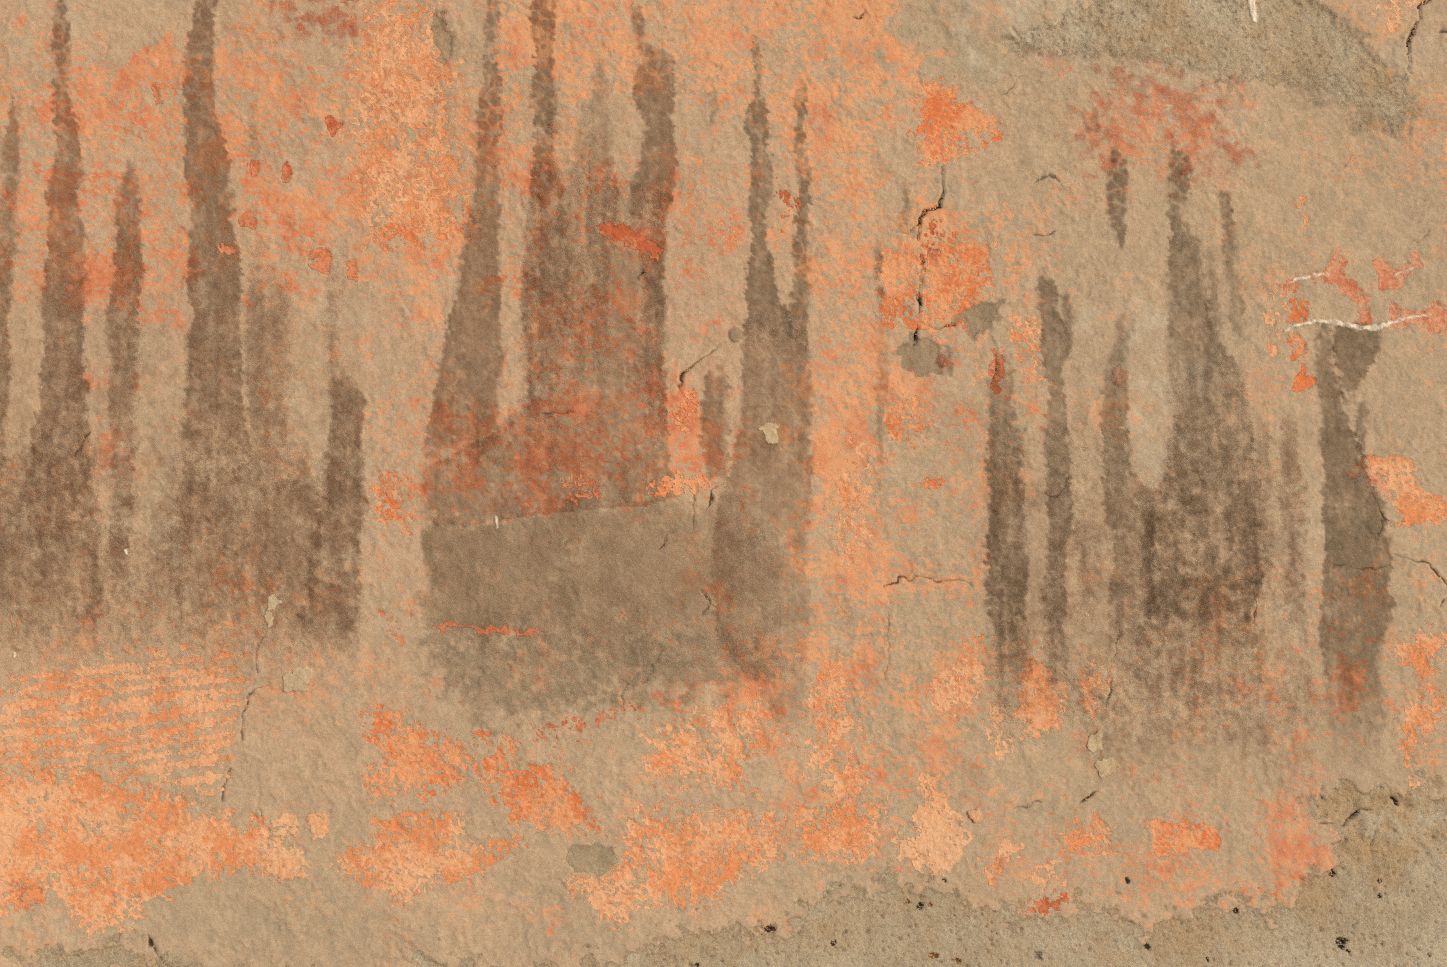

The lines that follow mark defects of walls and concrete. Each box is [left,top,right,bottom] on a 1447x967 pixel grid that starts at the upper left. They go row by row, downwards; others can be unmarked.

crack [1406,0,1447,54]
peeling [308,0,483,281]
peeling [902,76,1013,170]
peeling [596,221,662,261]
peeling [774,177,801,233]
crack [917,191,944,264]
crack [913,298,953,345]
peeling [874,219,1048,450]
peeling [759,422,779,444]
peeling [646,470,713,498]
peeling [0,640,314,967]
peeling [329,622,1447,967]